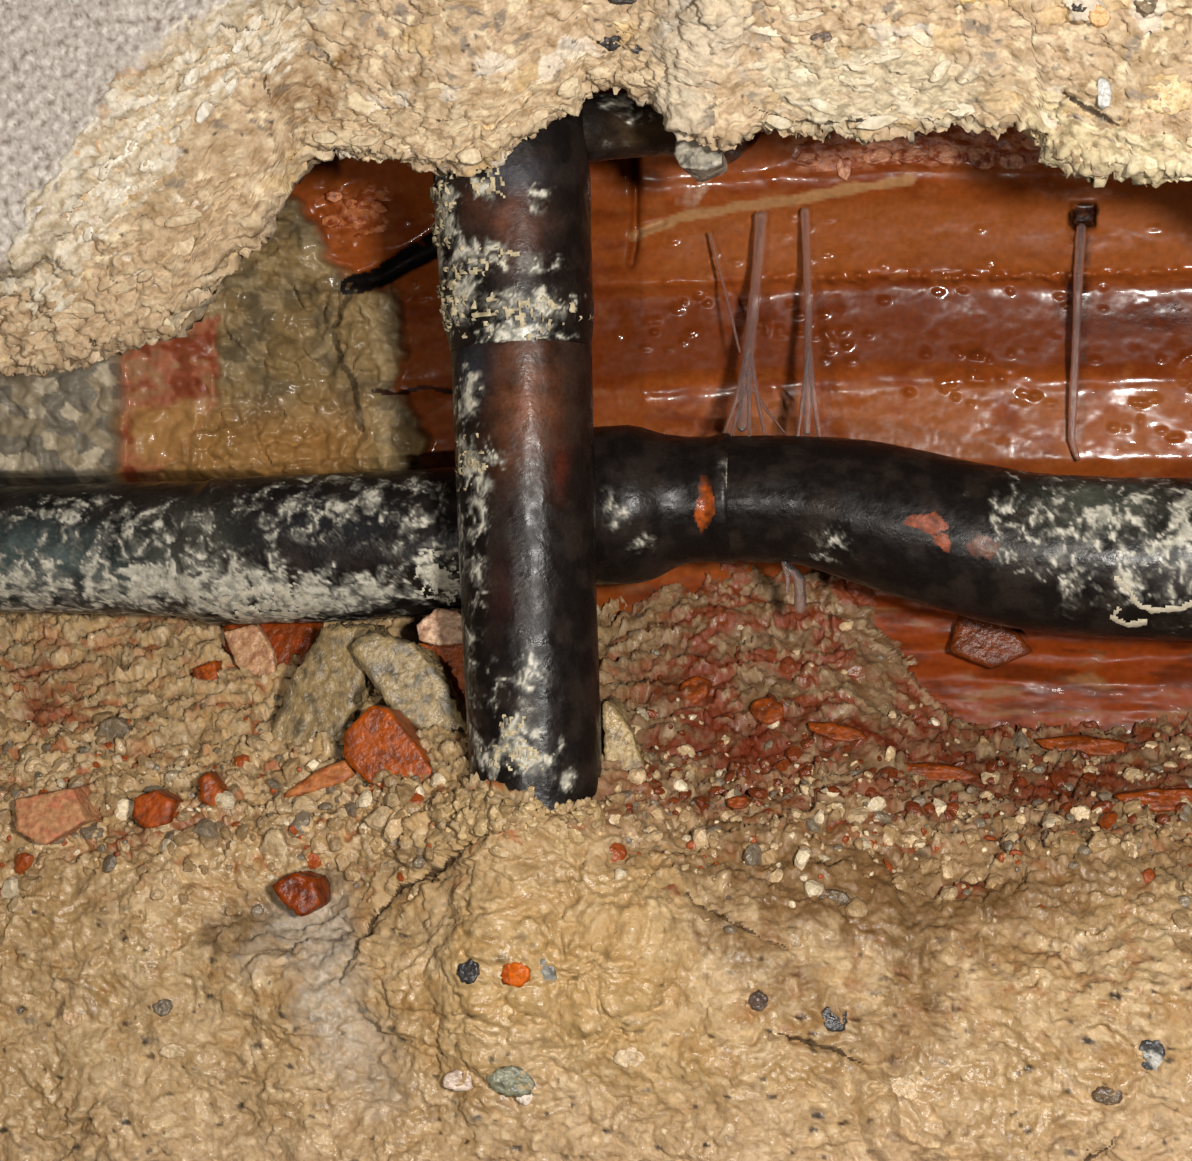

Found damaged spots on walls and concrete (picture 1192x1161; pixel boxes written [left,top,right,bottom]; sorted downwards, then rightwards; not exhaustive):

spalling [749,26,782,38]
spalling [287,50,666,166]
spalling [748,30,1192,188]
spalling [0,0,310,377]
spalling [320,185,393,241]
spalling [674,139,728,182]
peeling [694,485,714,528]
peeling [906,511,951,551]
crack [338,834,488,983]
water stain [210,899,357,1046]
crack [778,1033,864,1066]
crack [1084,1139,1113,1161]